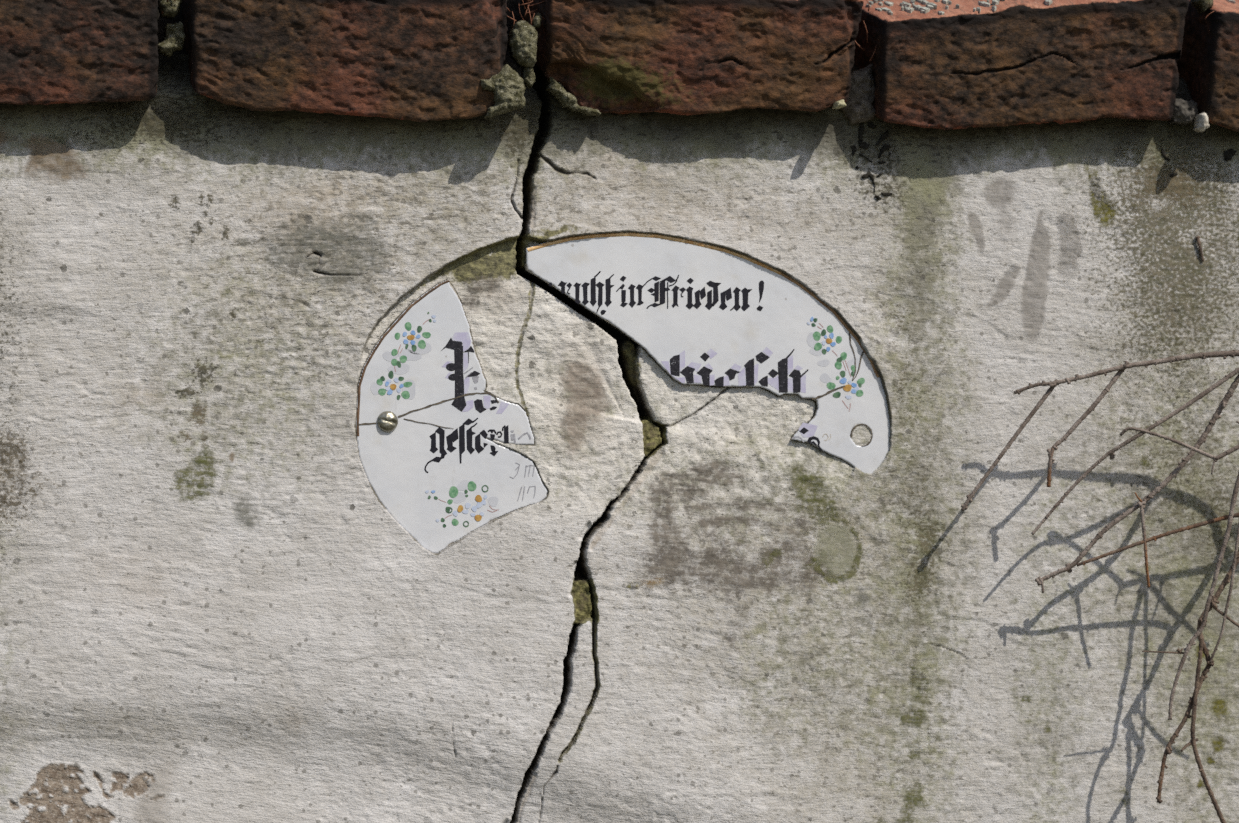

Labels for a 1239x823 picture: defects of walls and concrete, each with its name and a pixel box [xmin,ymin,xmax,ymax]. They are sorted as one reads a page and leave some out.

crack [949,50,1081,78]
crack [1119,50,1181,72]
damp [0,212,54,560]
crack [507,78,731,823]
peeling [7,766,165,823]